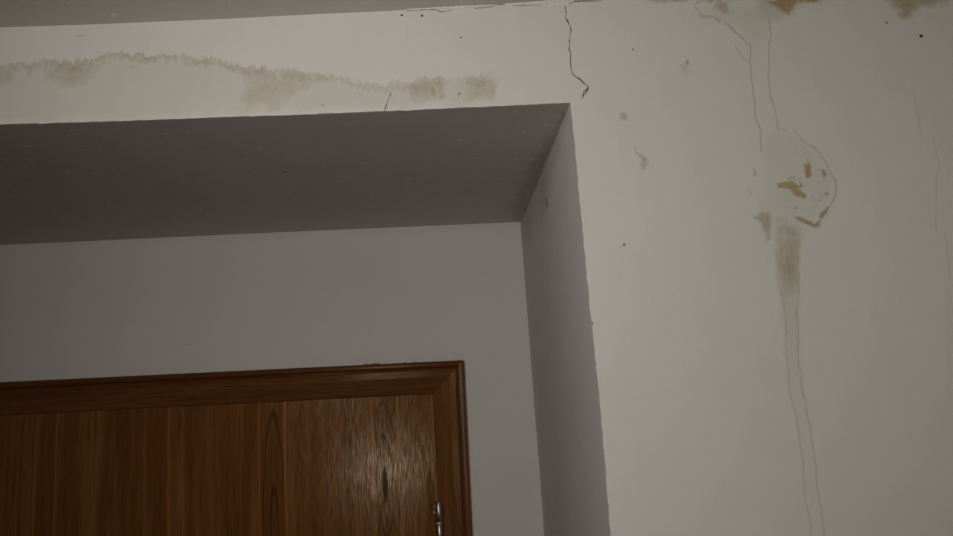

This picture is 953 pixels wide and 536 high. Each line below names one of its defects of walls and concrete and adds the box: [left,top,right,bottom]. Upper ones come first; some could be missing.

crack [565,0,597,98]
peeling [778,164,826,197]